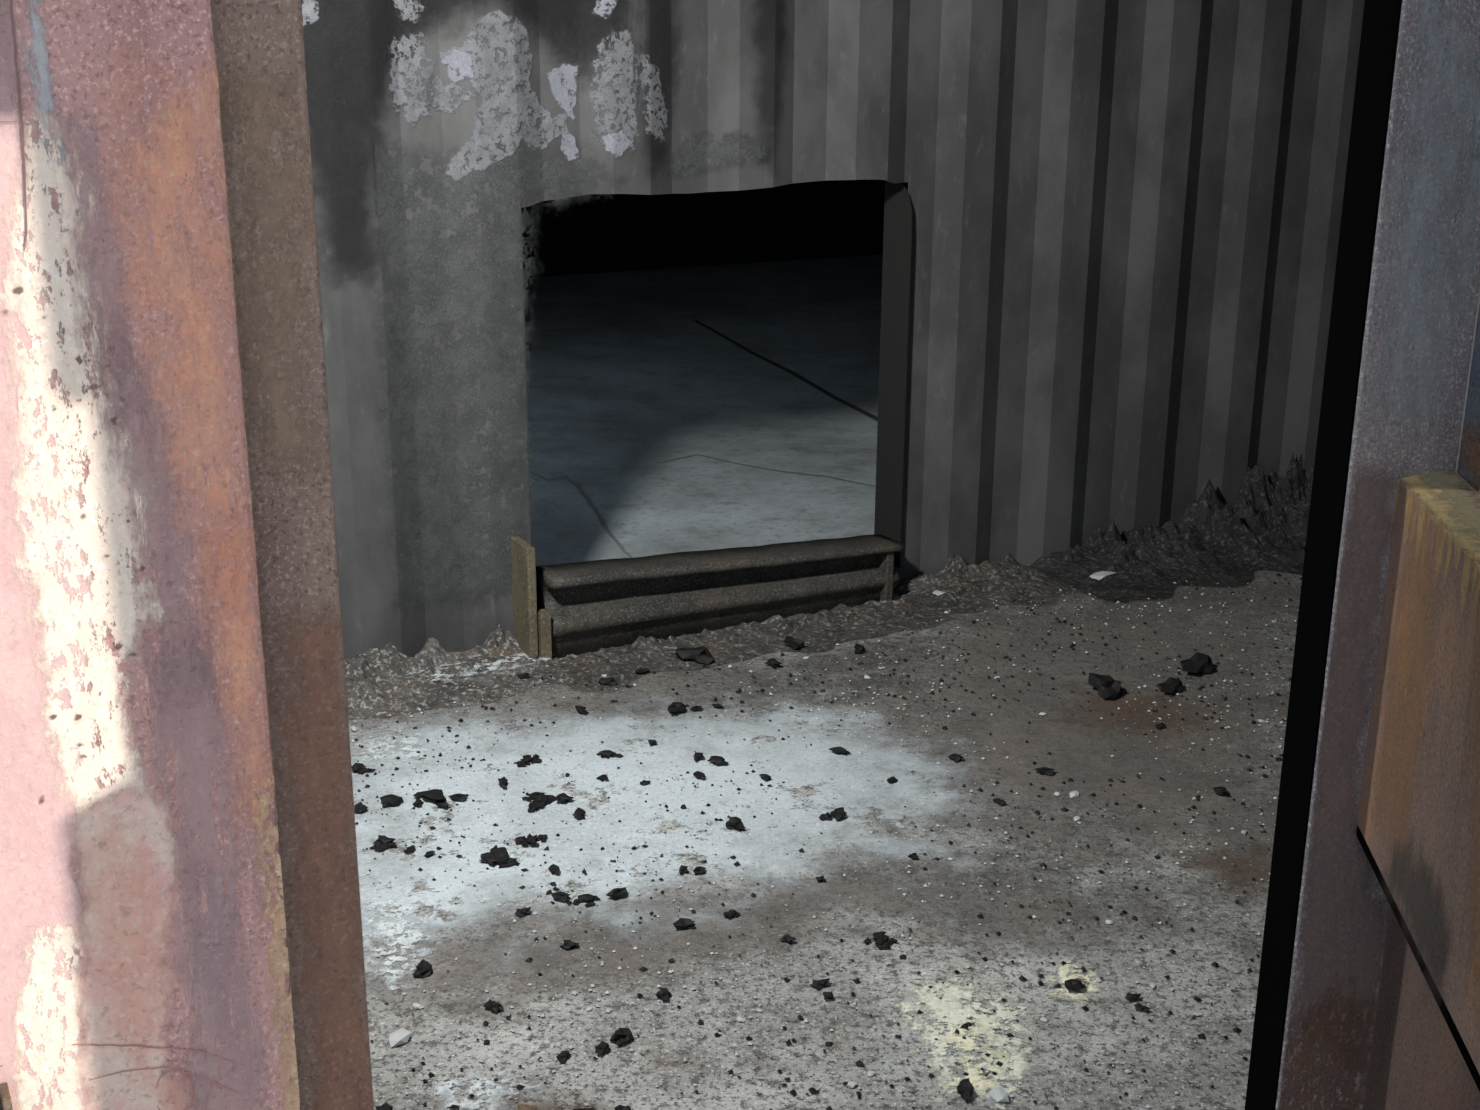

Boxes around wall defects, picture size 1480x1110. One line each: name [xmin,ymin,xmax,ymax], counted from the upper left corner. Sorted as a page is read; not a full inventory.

peeling [389,0,669,181]
corrosion [136,73,374,1110]
corrosion [1280,995,1371,1110]